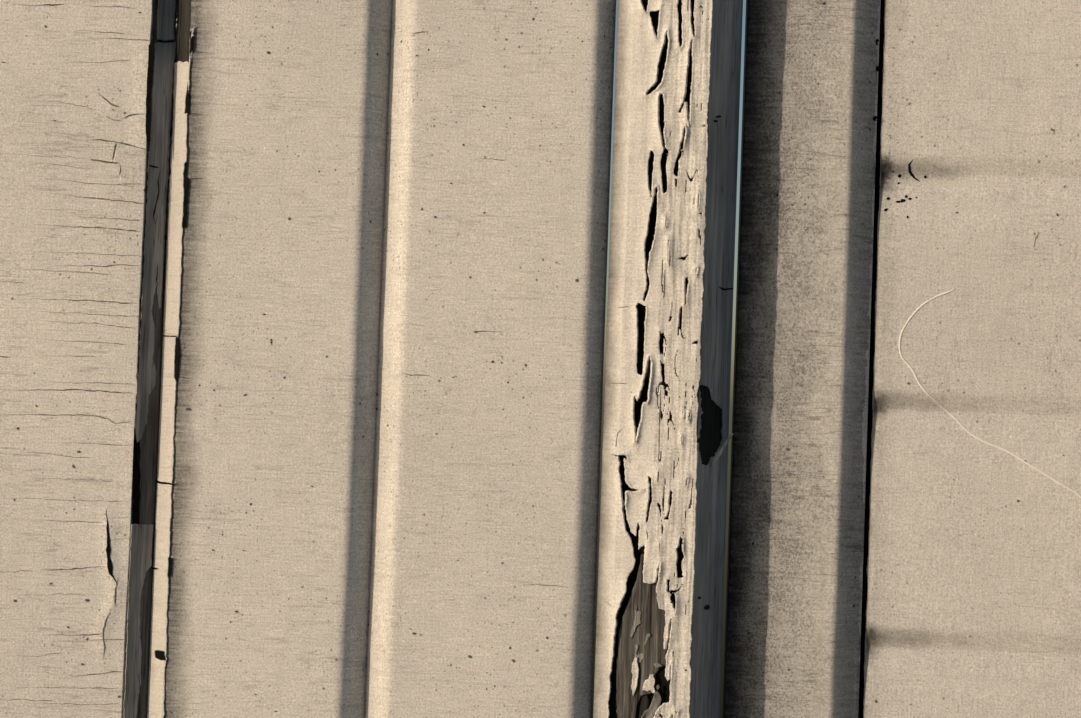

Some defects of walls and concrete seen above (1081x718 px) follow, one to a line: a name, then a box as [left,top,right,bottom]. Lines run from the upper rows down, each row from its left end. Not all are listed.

crack [0,96,177,705]
peeling [698,385,733,466]
peeling [616,554,668,718]